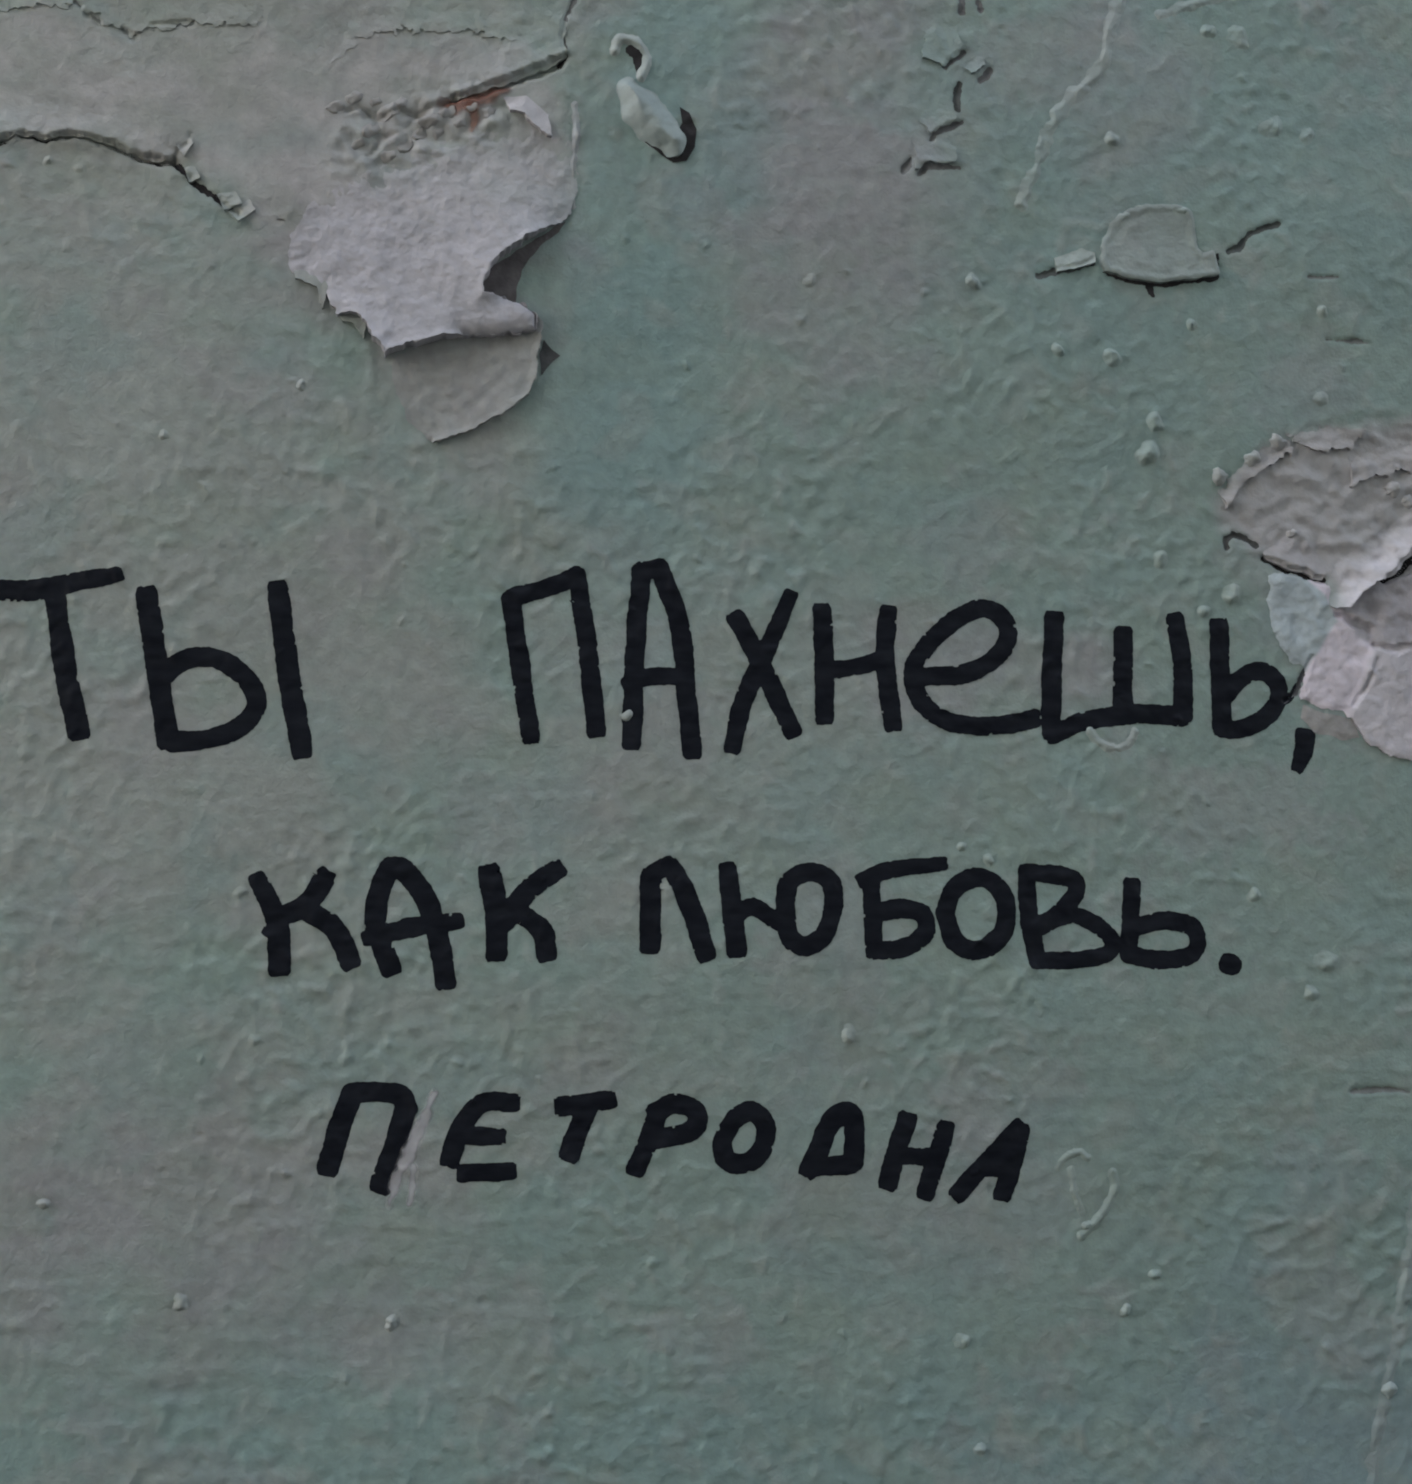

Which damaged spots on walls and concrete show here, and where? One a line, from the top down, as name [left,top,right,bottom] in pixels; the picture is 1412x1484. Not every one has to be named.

crack [0,95,256,222]
peeling [0,0,582,443]
spalling [1212,425,1412,761]